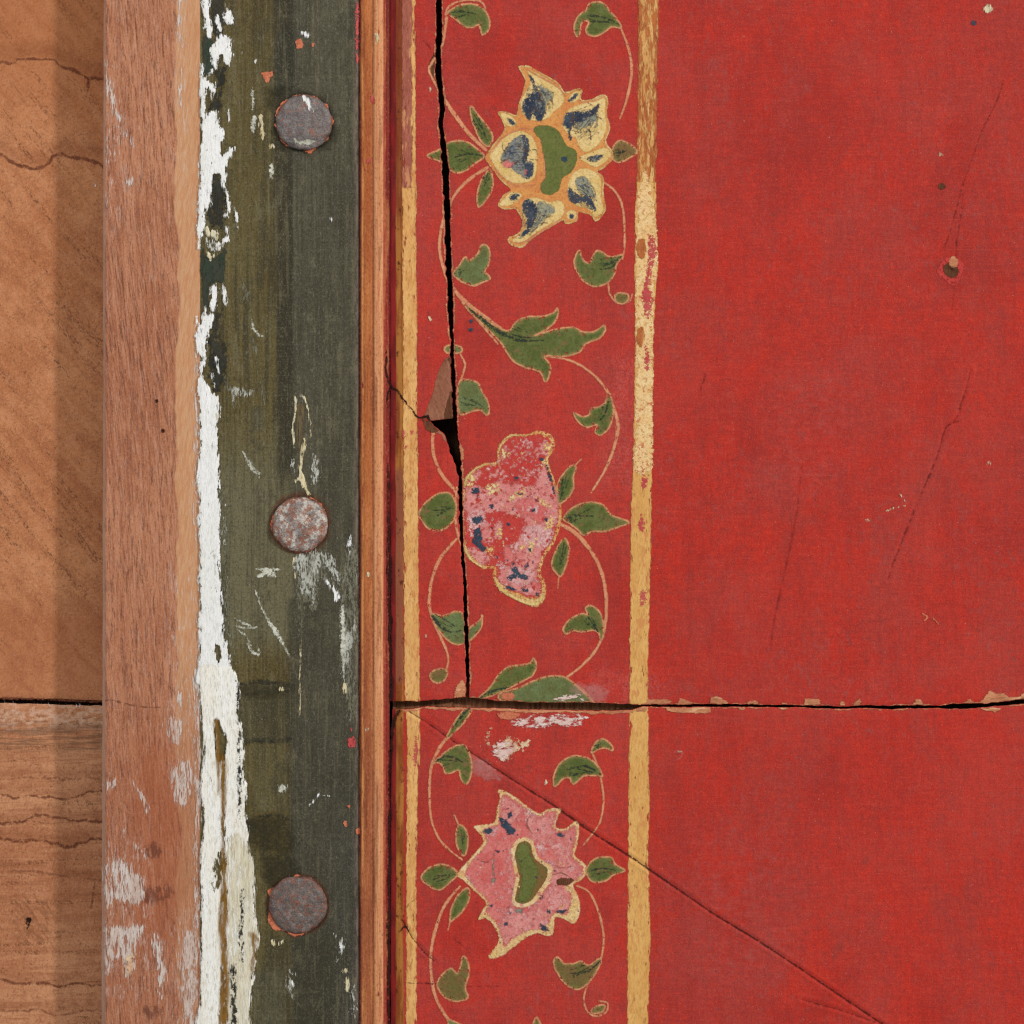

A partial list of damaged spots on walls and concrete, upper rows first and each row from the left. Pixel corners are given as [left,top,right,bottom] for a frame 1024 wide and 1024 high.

peeling [102,0,284,1024]
corrosion [268,913,307,937]
crack [384,0,1024,1024]